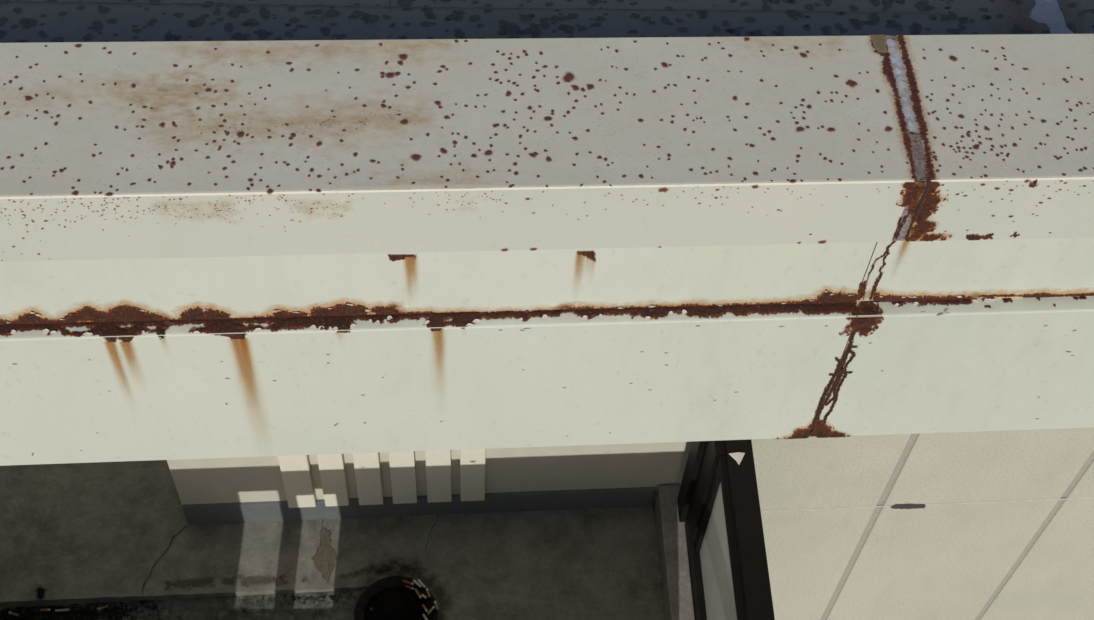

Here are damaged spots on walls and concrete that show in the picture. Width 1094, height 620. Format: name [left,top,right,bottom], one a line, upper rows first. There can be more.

corrosion [4,76,71,126]
corrosion [194,79,271,186]
corrosion [380,54,416,125]
corrosion [429,50,636,215]
corrosion [779,99,835,132]
corrosion [817,72,869,103]
corrosion [689,147,815,205]
corrosion [388,255,416,274]
corrosion [577,251,596,269]
crack [863,181,930,300]
corrosion [0,281,1094,388]
crack [811,330,857,432]